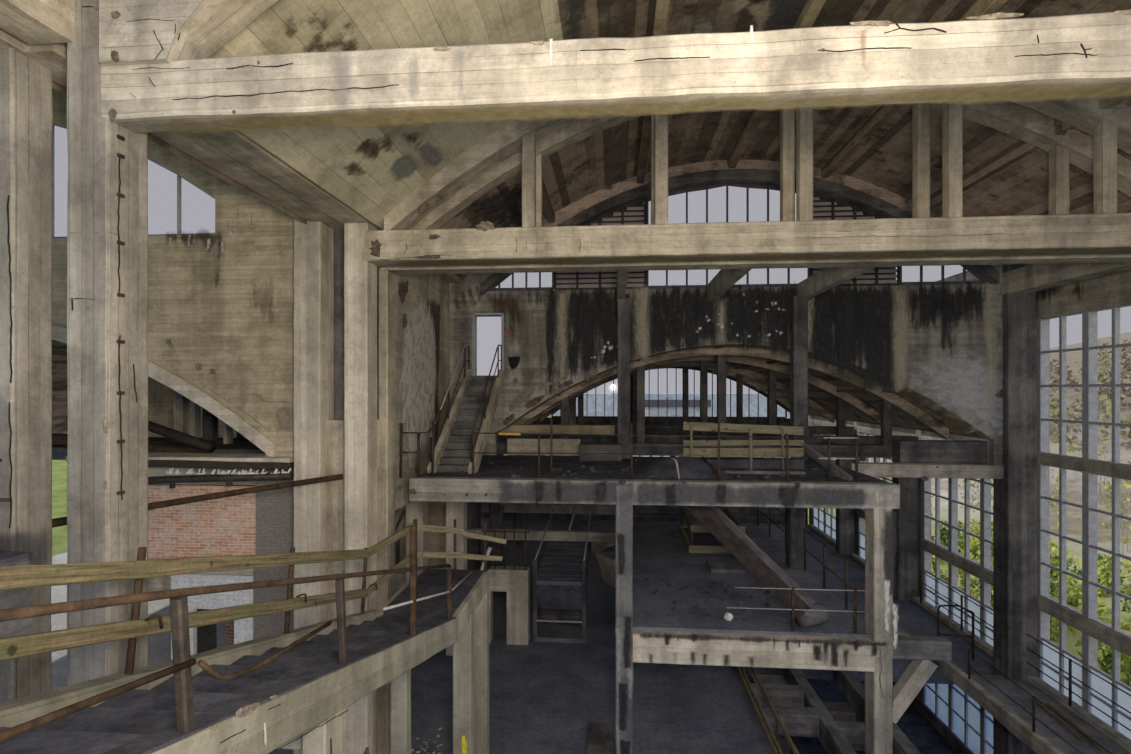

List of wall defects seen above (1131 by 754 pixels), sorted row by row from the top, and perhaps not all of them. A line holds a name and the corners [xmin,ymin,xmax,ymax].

crack [127,19,399,100]
crack [818,23,947,52]
crack [1015,35,1098,58]
crack [115,157,123,297]
crack [6,195,14,528]
crack [118,335,138,500]
peeling [398,281,437,468]
damp [546,287,794,394]
damp [808,283,1003,435]